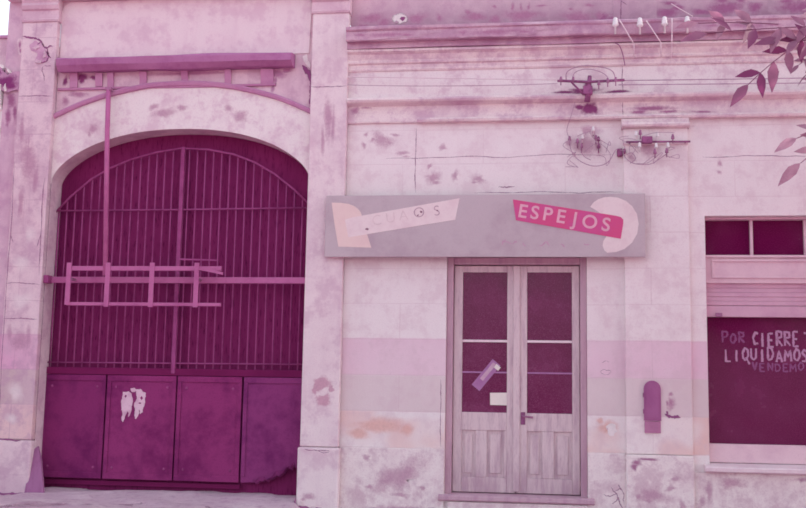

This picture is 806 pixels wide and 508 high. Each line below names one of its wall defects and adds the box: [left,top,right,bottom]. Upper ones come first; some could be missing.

water stain [350,0,613,40]
water stain [656,0,806,31]
peeling [308,371,338,409]